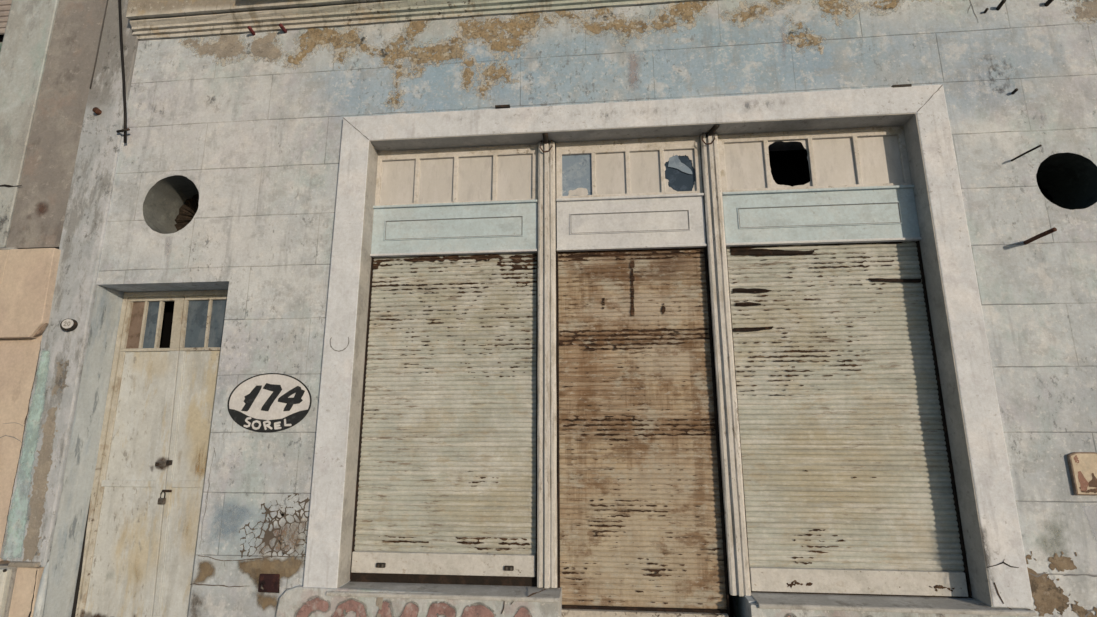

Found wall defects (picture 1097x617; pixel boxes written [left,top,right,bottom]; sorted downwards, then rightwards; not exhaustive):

peeling [179,0,931,111]
peeling [1063,0,1097,25]
rust [369,254,537,378]
rust [558,248,705,316]
rust [559,298,710,387]
rust [730,241,921,396]
rust [559,391,716,543]
crack [190,448,310,587]
rust [456,537,530,551]
rust [626,547,687,604]
rust [792,529,844,565]
flaking render [1025,551,1097,617]